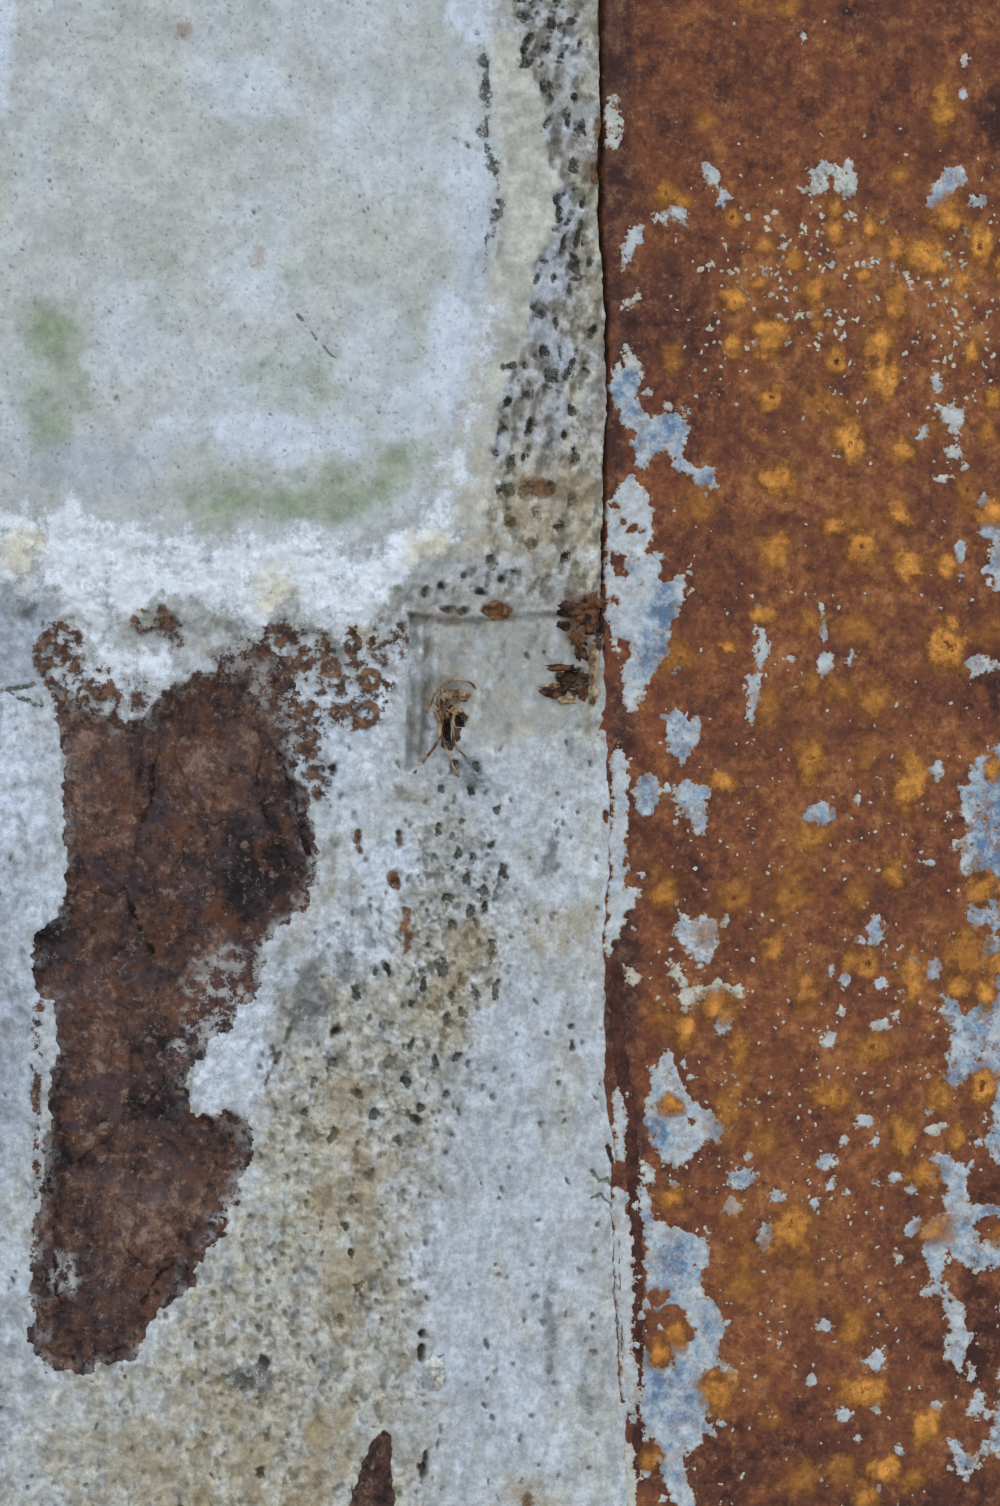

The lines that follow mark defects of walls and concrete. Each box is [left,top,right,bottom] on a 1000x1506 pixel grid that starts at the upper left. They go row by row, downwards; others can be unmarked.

damp [466,0,586,138]
damp [533,157,593,294]
corrosion [823,192,1000,403]
damp [0,300,597,830]
peeling [593,343,720,713]
corrosion [821,495,959,590]
corrosion [32,618,409,802]
damp [408,841,509,1031]
peeling [603,708,712,987]
corrosion [28,999,45,1316]
peeling [610,1048,739,1506]
peeling [869,741,1000,1482]